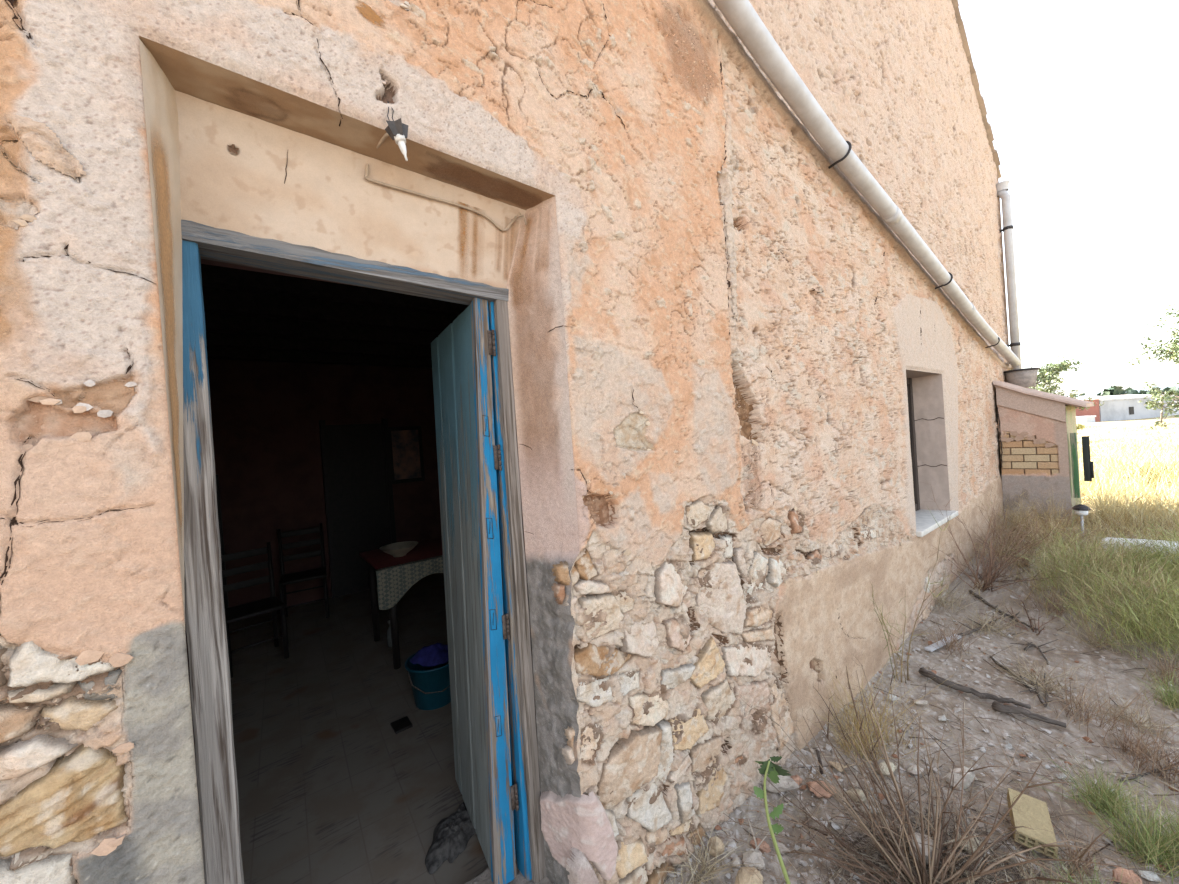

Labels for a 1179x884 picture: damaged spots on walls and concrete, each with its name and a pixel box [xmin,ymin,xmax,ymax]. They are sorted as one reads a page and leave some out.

crack [284,0,343,126]
crack [537,4,625,129]
spalling [12,376,137,450]
crack [0,436,152,636]
spalling [0,636,134,884]
spalling [540,491,911,884]